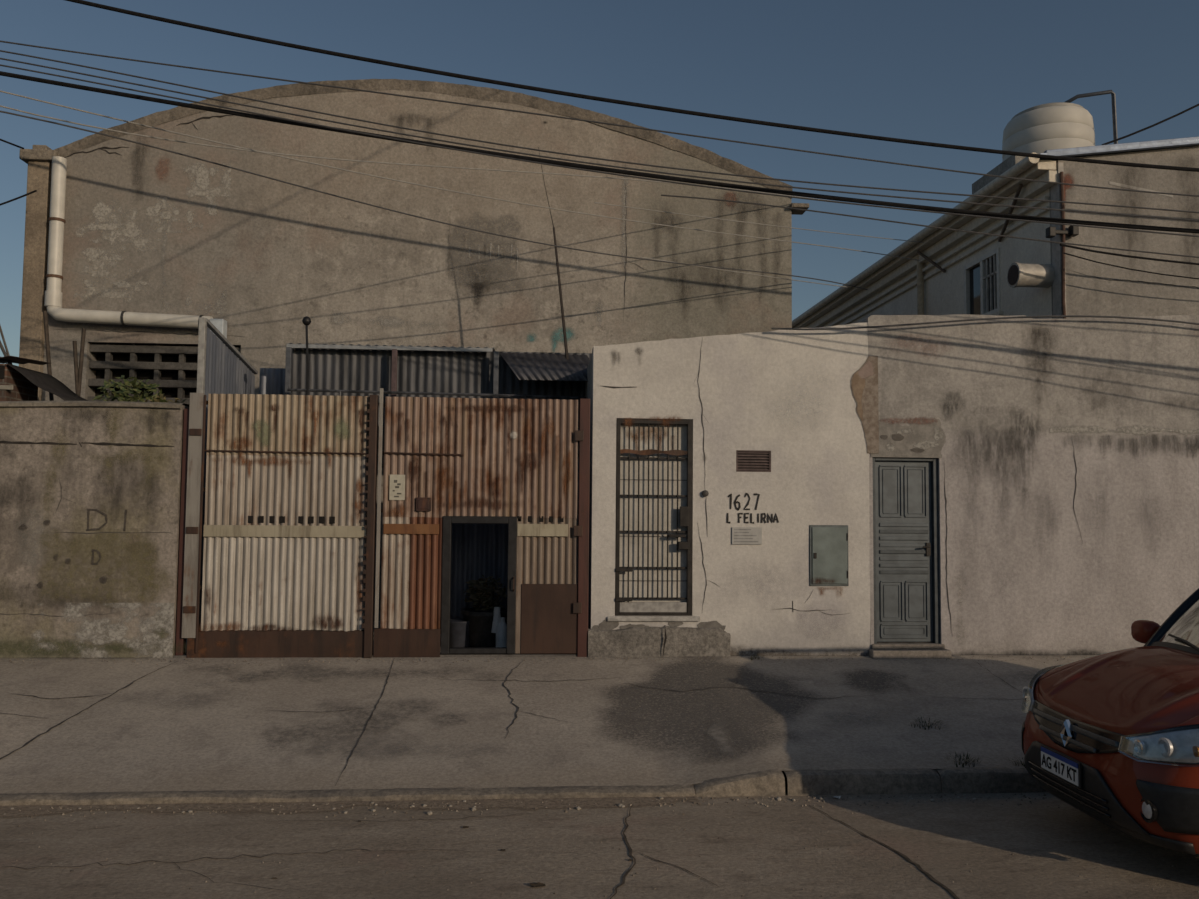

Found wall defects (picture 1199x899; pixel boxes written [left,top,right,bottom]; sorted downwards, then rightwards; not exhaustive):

crack [0,440,174,448]
crack [697,338,720,610]
flaking render [851,356,946,458]